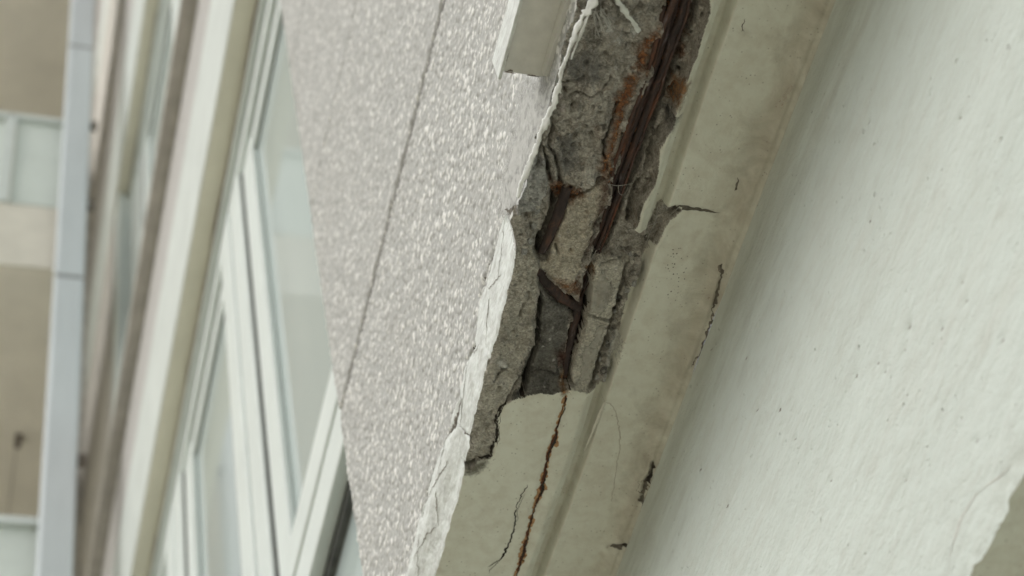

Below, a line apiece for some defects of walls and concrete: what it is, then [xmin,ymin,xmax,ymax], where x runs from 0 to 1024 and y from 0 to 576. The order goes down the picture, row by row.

spalling [464,0,711,470]
corrosion [594,28,660,224]
corrosion [667,68,690,106]
crack [671,205,718,213]
crack [692,264,724,365]
crack [488,395,567,576]